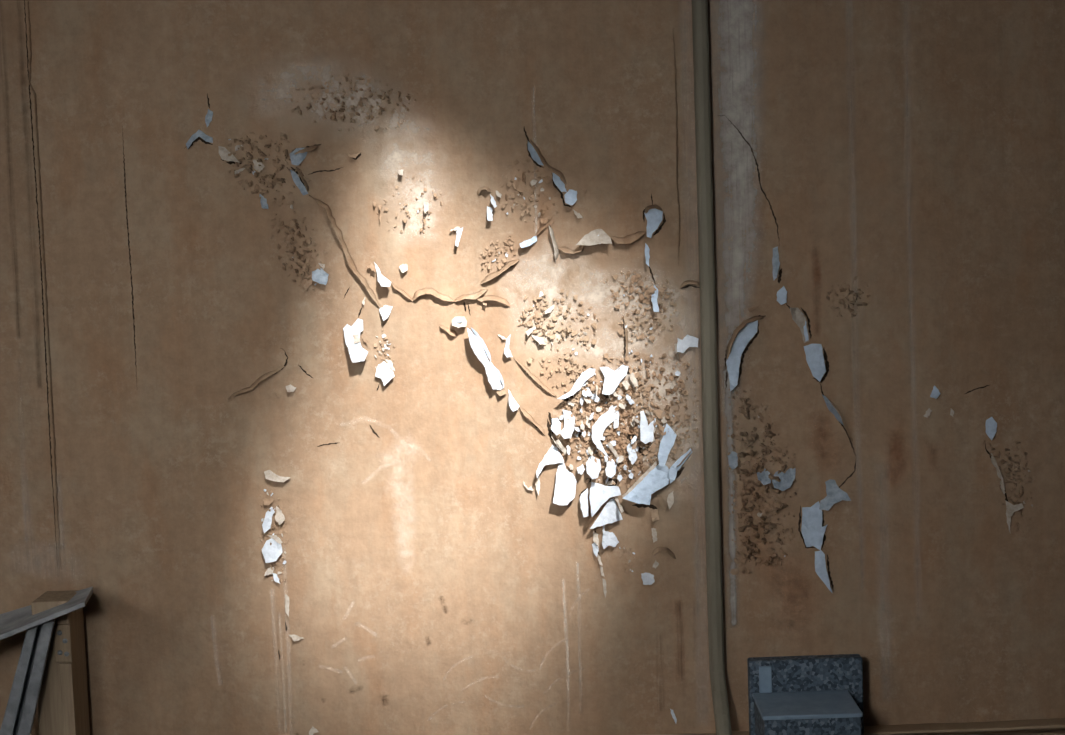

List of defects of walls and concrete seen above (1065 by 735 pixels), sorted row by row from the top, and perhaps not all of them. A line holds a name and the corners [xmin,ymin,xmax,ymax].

crack [308,195,519,321]
peeling [477,186,502,221]
peeling [524,127,587,218]
peeling [520,194,666,312]
crack [718,115,780,246]
peeling [343,308,395,390]
crack [498,334,557,397]
crack [621,319,629,362]
peeling [440,316,701,598]
peeling [259,470,303,641]